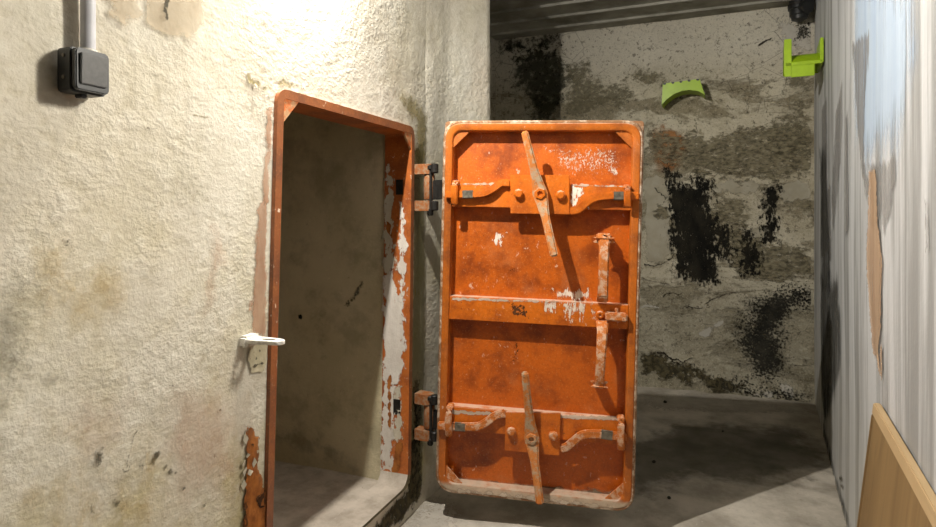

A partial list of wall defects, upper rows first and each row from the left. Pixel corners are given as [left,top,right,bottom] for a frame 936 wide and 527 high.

peeling [109,0,204,37]
damp [499,33,663,120]
damp [785,77,809,90]
damp [663,164,785,286]
peeling [379,164,409,472]
damp [712,101,840,463]
rust [241,427,266,527]